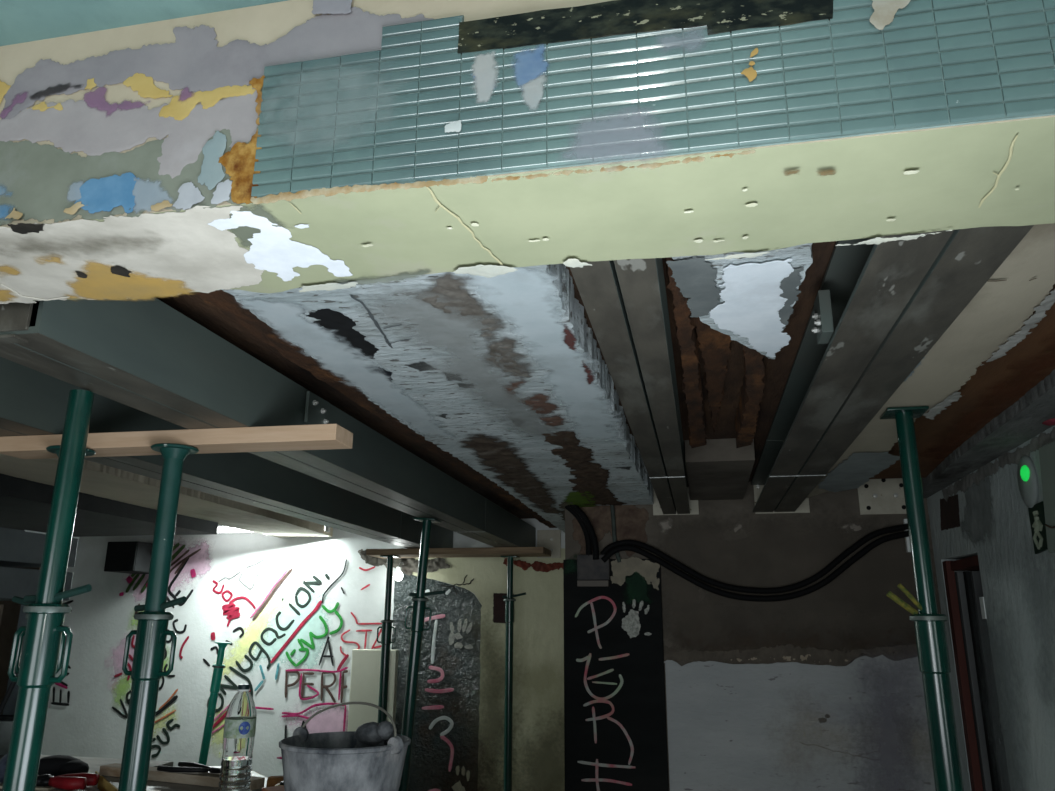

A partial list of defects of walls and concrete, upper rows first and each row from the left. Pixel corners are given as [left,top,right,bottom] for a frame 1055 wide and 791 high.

spalling [0,0,918,666]
spalling [836,230,952,246]